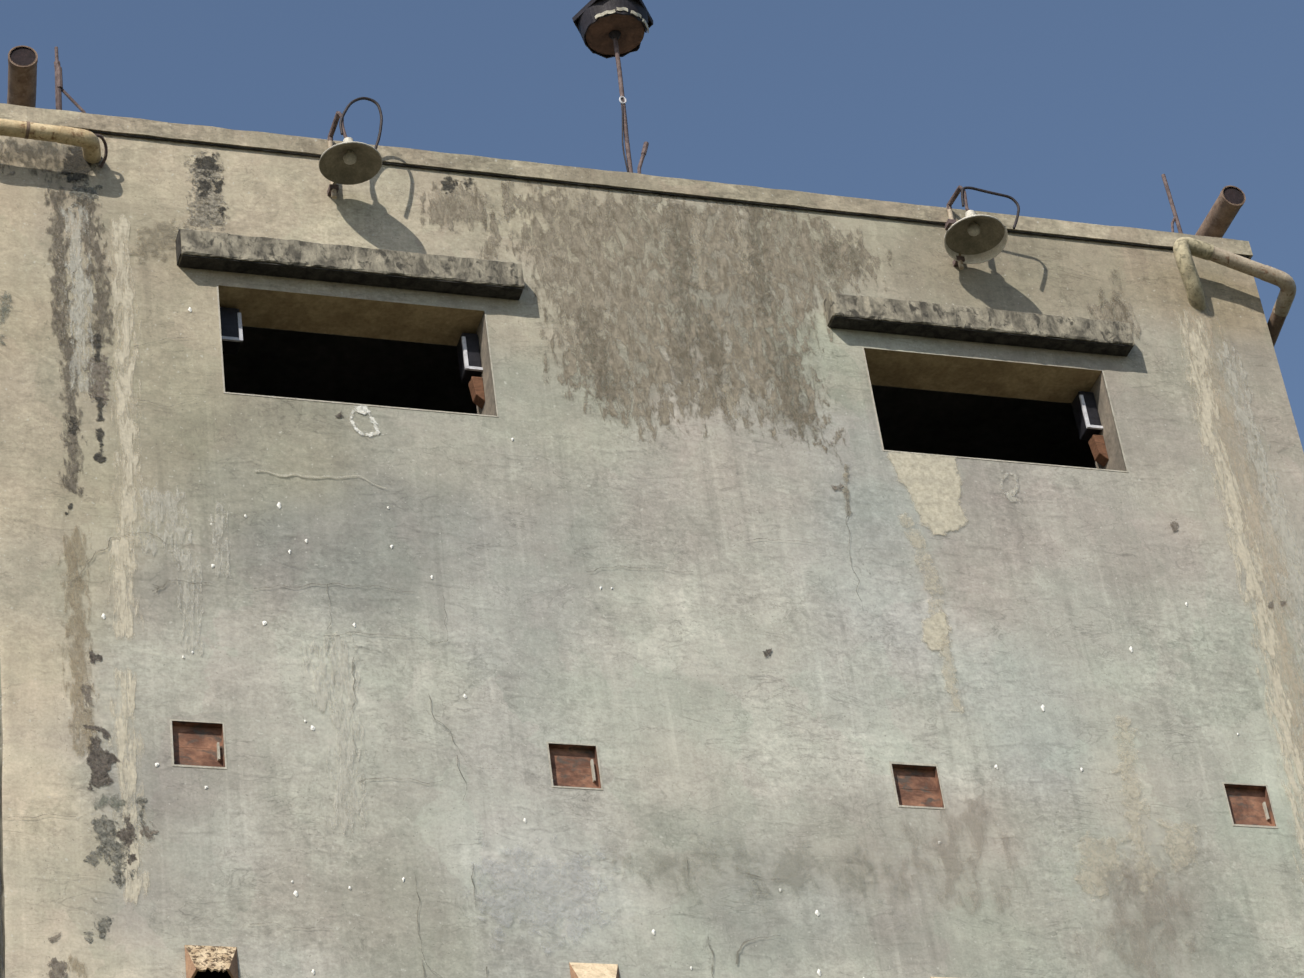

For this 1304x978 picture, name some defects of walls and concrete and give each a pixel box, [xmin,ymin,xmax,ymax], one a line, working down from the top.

damp [0,140,182,754]
damp [420,174,892,454]
damp [110,670,149,904]